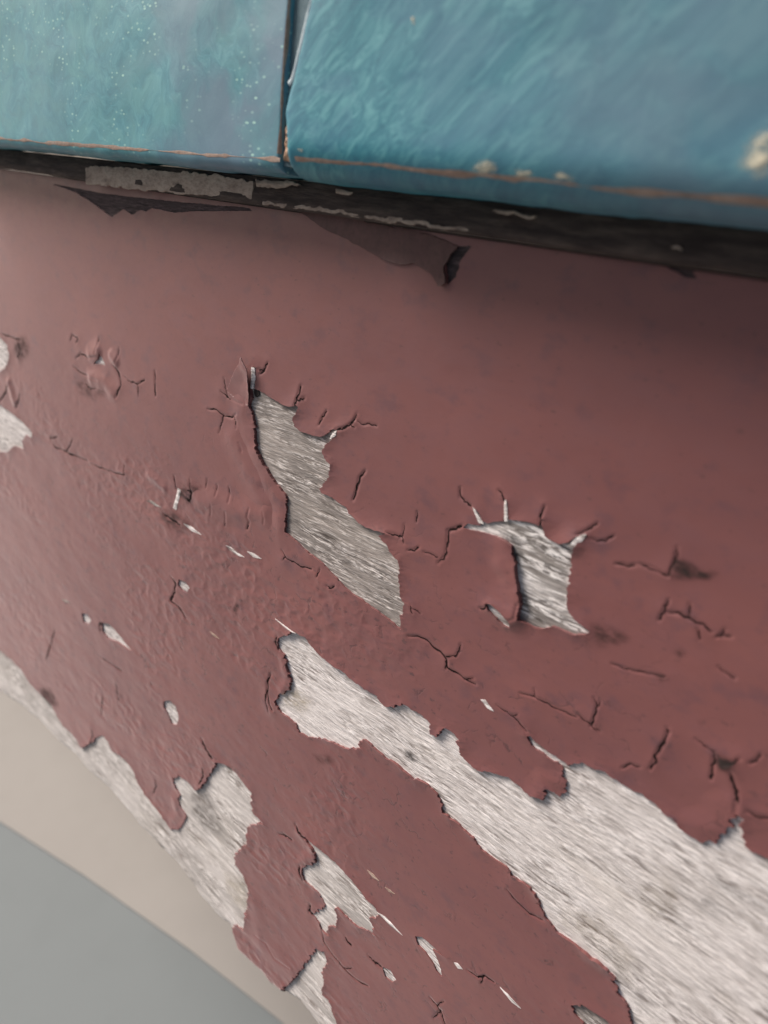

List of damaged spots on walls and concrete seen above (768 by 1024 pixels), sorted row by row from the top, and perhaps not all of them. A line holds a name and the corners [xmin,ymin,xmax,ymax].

peeling [54,184,252,217]
peeling [0,406,32,452]
crack [319,411,377,430]
peeling [226,357,404,627]
crack [387,491,471,561]
peeling [464,500,589,641]
crack [579,523,731,639]
crack [410,605,475,684]
peeling [0,651,262,928]
peeling [276,620,768,1024]
crack [623,729,669,769]
crack [696,739,768,819]